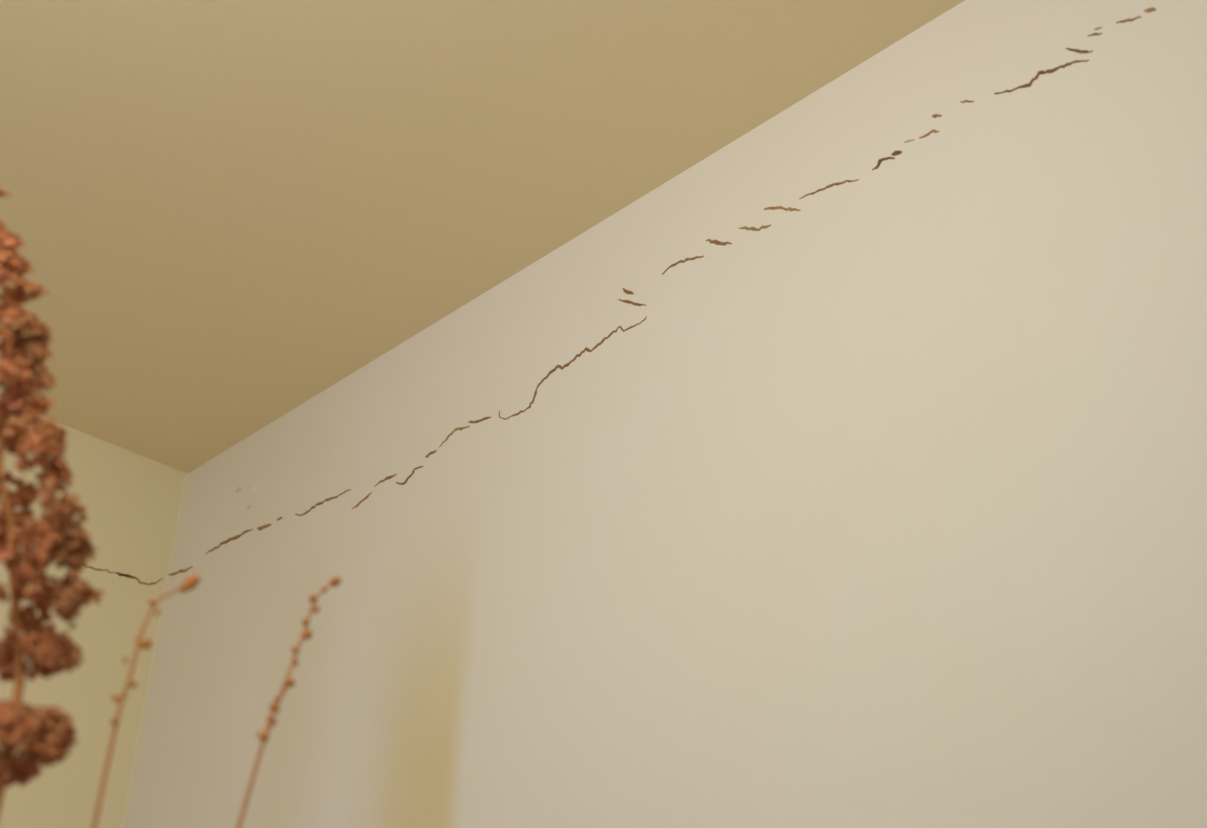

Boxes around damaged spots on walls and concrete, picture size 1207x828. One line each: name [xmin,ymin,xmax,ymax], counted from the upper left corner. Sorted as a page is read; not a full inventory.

crack [662,7,1156,275]
crack [85,288,647,585]